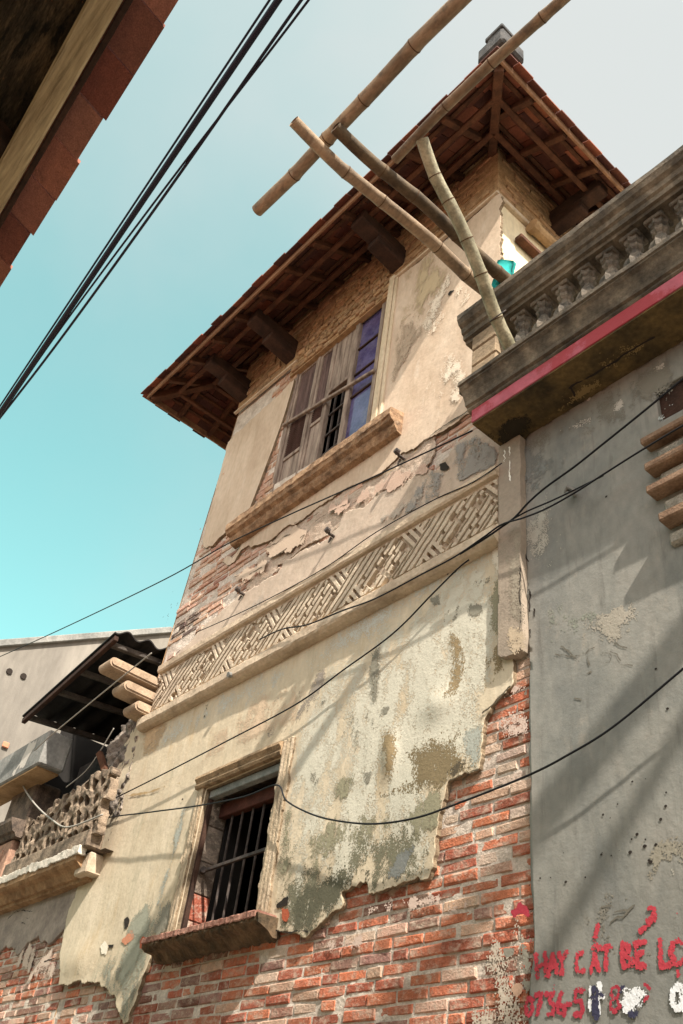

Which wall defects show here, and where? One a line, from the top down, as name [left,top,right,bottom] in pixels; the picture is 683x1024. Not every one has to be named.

flaking render [328,414,477,515]
flaking render [167,515,329,661]
flaking render [57,658,551,1024]
water stain [275,730,476,936]